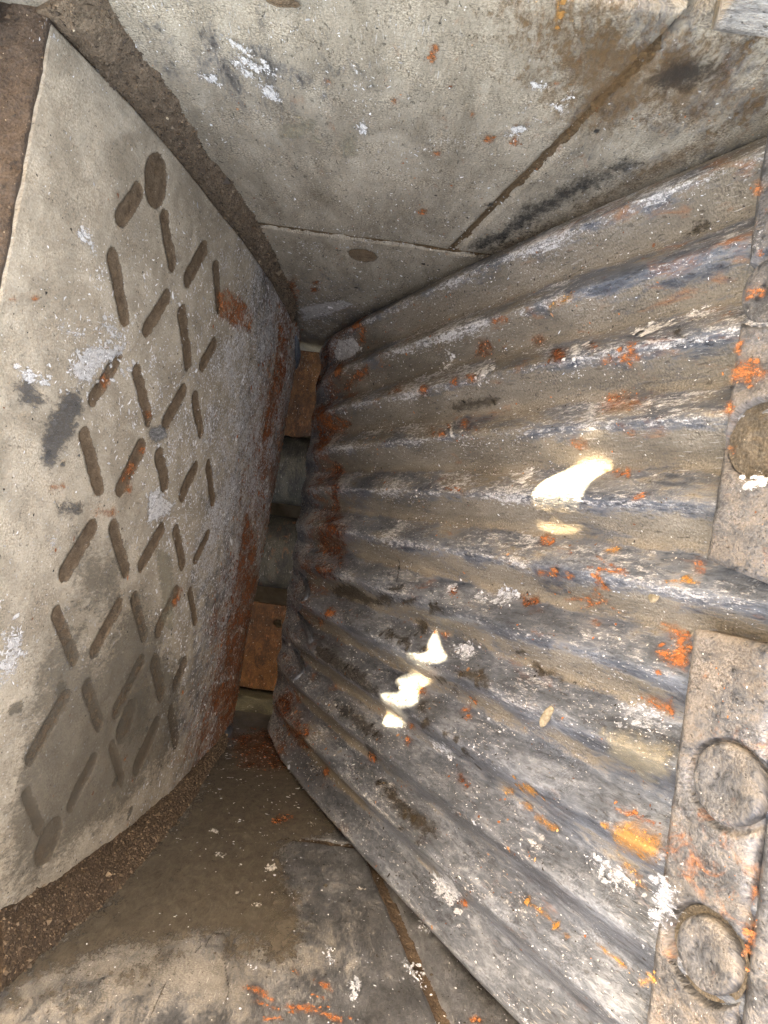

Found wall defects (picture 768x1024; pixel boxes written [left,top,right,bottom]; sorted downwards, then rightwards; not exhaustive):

rust [722,341,765,389]
rust [298,336,368,580]
rust [181,266,342,797]
rust [537,543,626,625]
rust [655,624,693,675]
rust [600,801,668,886]
rust [247,980,352,1022]